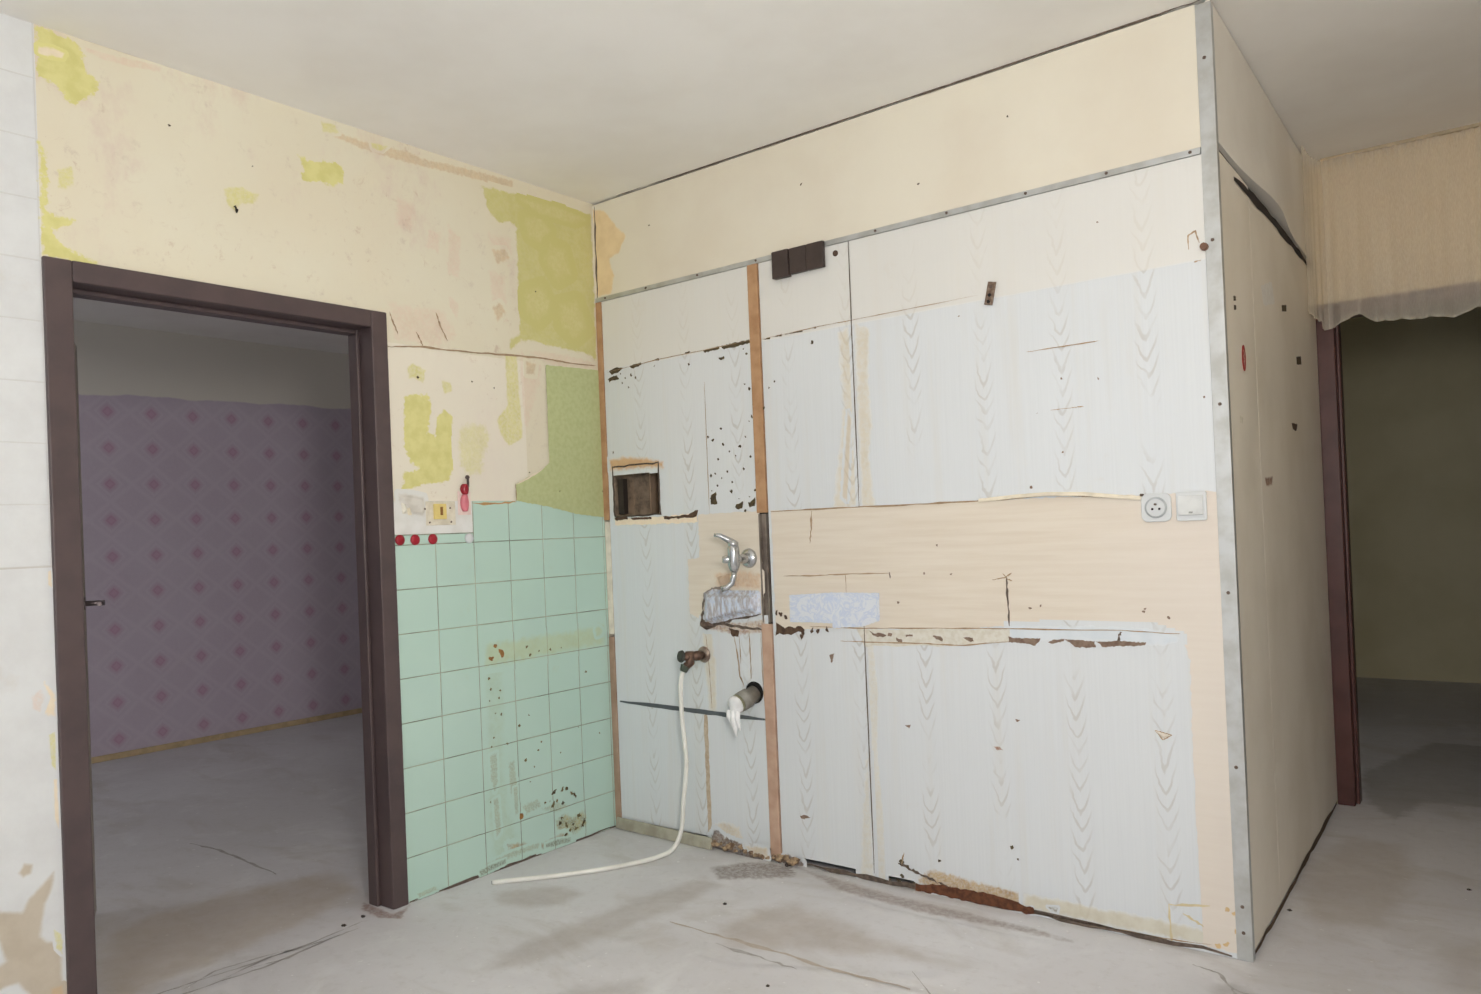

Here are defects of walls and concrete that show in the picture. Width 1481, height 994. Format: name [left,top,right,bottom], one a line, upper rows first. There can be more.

peeling [28,22,107,112]
peeling [30,130,106,266]
peeling [220,182,263,215]
peeling [293,148,348,192]
peeling [393,180,629,498]
peeling [26,677,61,832]
peeling [615,491,1237,953]
peeling [0,860,67,994]
water stain [1271,739,1481,994]